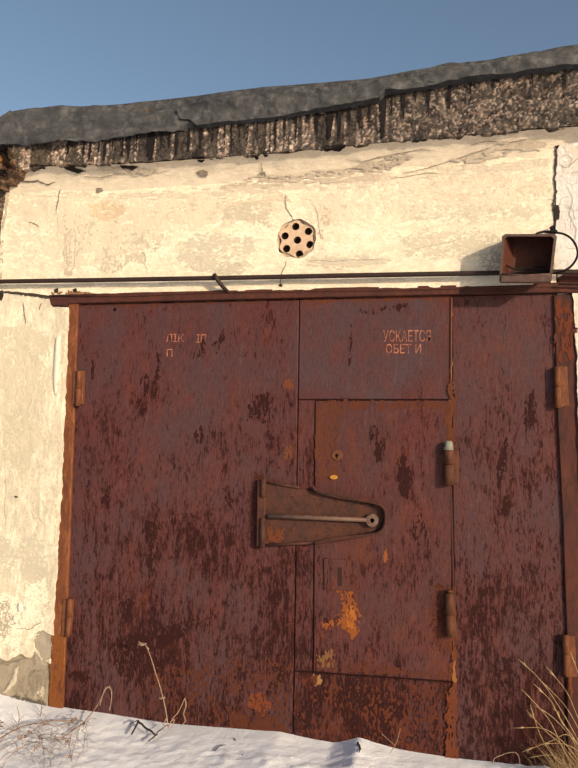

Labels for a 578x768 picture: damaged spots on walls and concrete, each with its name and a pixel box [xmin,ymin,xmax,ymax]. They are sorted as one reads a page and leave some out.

spalling [0,145,27,192]
crack [550,149,578,249]
corrosion [553,299,575,363]
corrosion [248,471,285,552]
spalling [0,532,53,705]
corrosion [49,633,65,708]
corrosion [137,578,461,759]